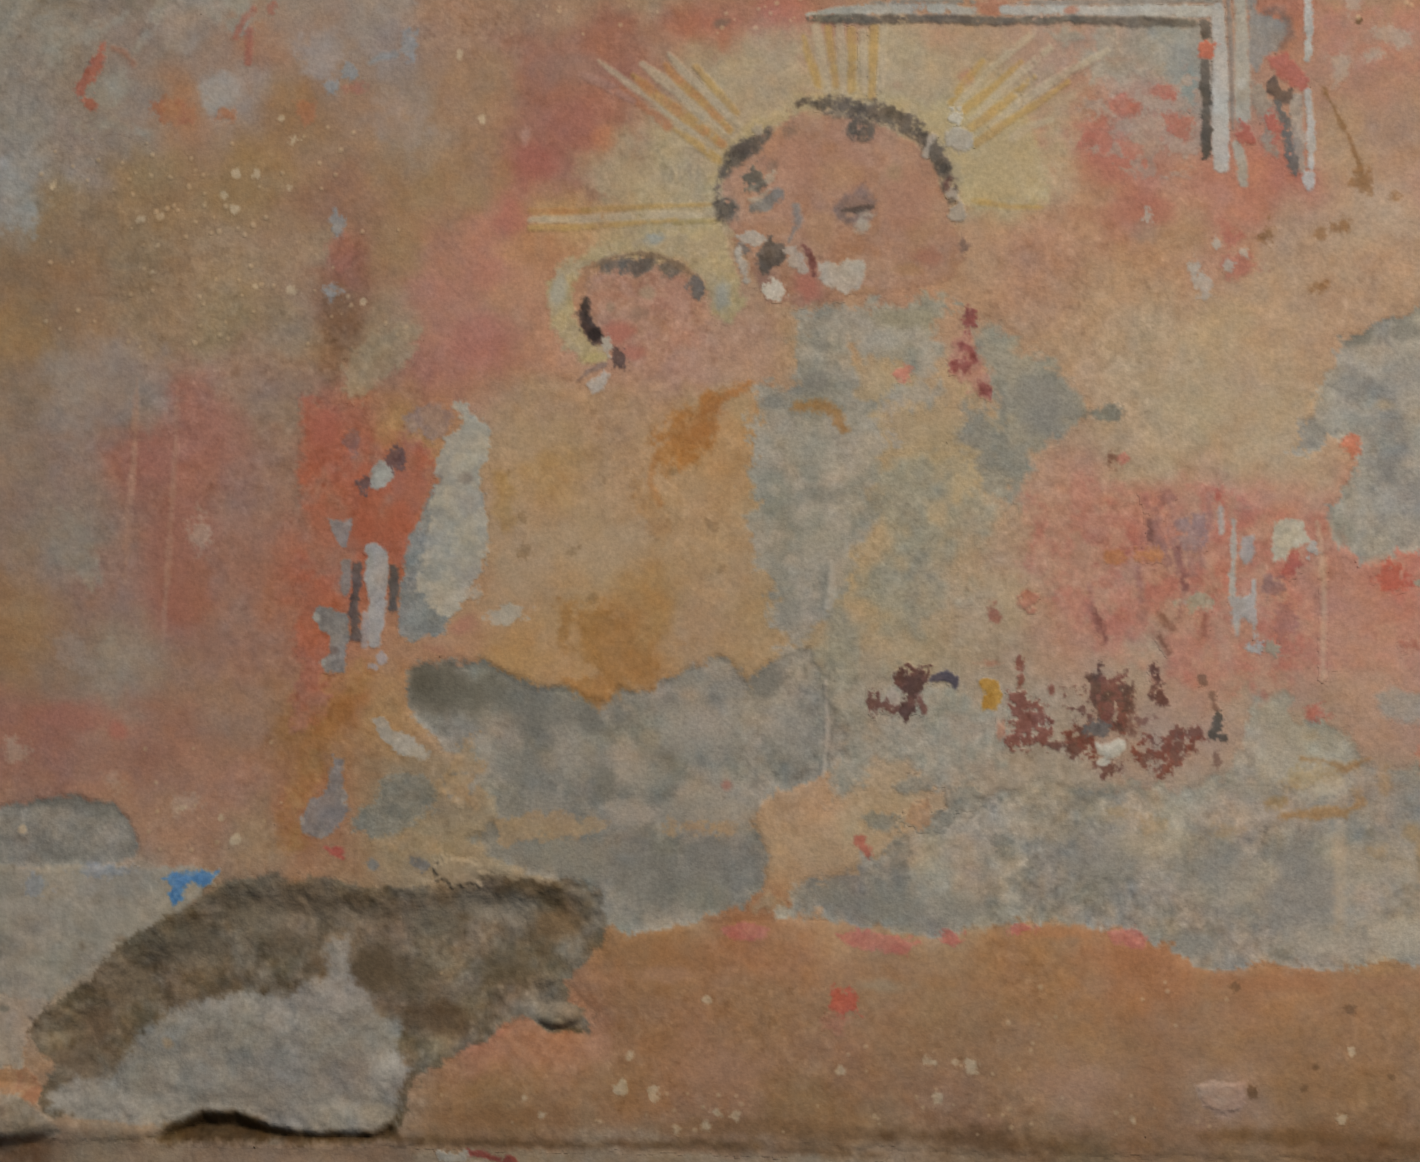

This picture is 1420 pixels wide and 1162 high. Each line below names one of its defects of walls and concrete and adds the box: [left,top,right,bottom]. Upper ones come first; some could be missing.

spalling [28,221,1420,1152]
peeling [0,790,142,866]
peeling [409,1147,851,1162]